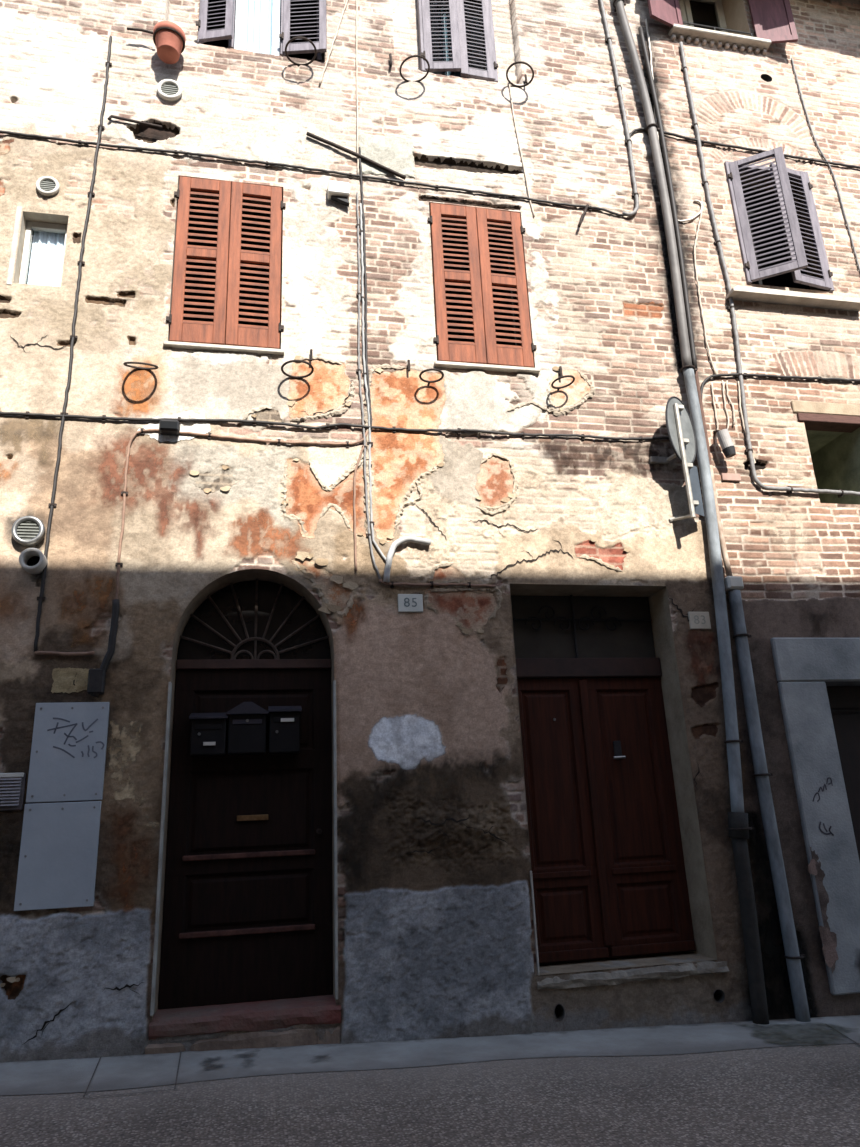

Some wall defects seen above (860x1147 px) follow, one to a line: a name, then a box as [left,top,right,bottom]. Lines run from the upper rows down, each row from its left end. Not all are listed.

spalling [129,120,179,143]
peeling [506,366,595,416]
peeling [243,354,447,618]
peeling [475,451,519,515]
crack [415,504,574,579]
spalling [691,682,719,707]
spalling [691,724,718,739]
water stain [338,767,408,887]
peeling [808,847,838,973]
spalling [0,975,26,1000]
crack [106,982,143,993]
crack [22,1003,71,1045]